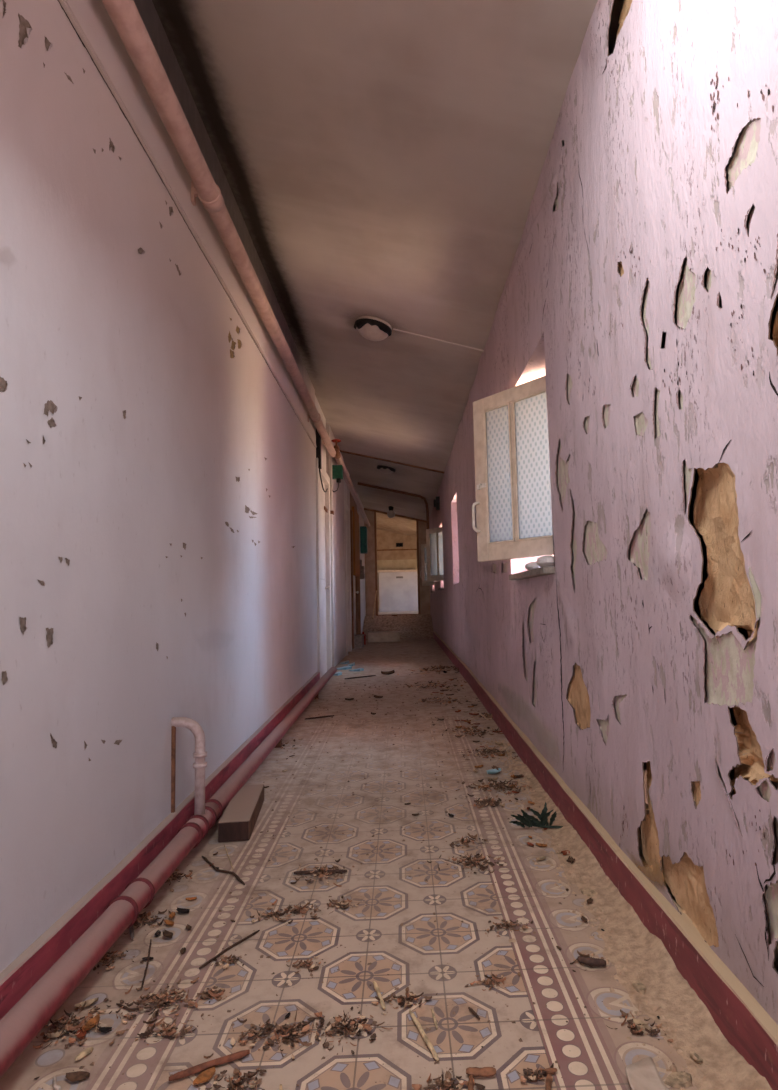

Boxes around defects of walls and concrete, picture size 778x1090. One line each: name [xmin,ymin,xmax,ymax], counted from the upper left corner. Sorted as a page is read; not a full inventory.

flaking render [616,0,633,40]
peeling [724,118,761,193]
flaking render [681,461,778,865]
flaking render [568,664,627,743]
flaking render [641,761,719,947]